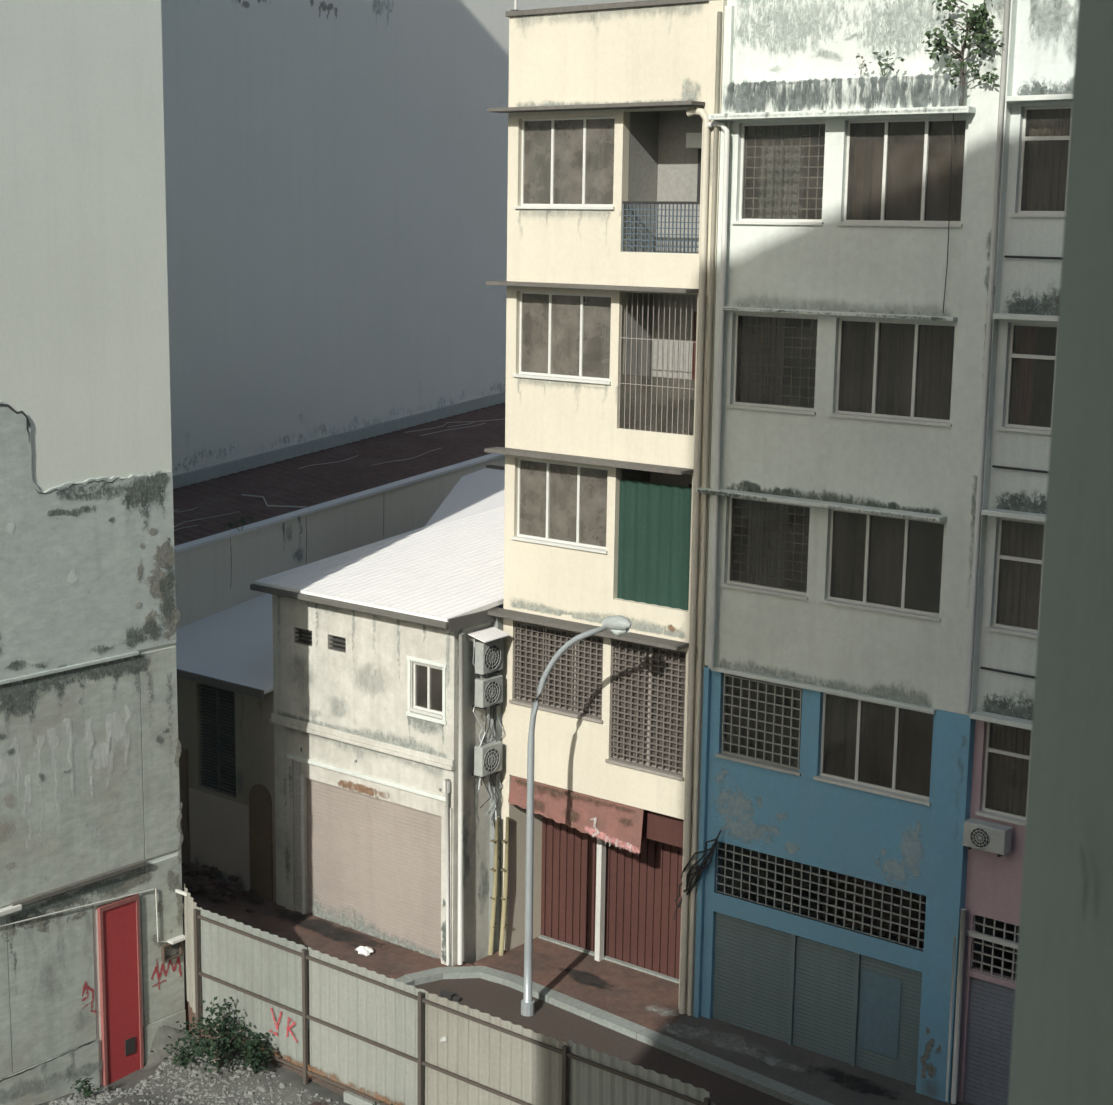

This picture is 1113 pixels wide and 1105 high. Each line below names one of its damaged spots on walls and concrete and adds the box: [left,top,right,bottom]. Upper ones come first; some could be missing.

leakage [310,0,337,18]
leakage [1030,0,1079,56]
leakage [723,73,962,116]
leakage [1018,77,1074,96]
flaking render [0,401,181,680]
leakage [0,564,176,726]
corrosion [338,780,384,798]